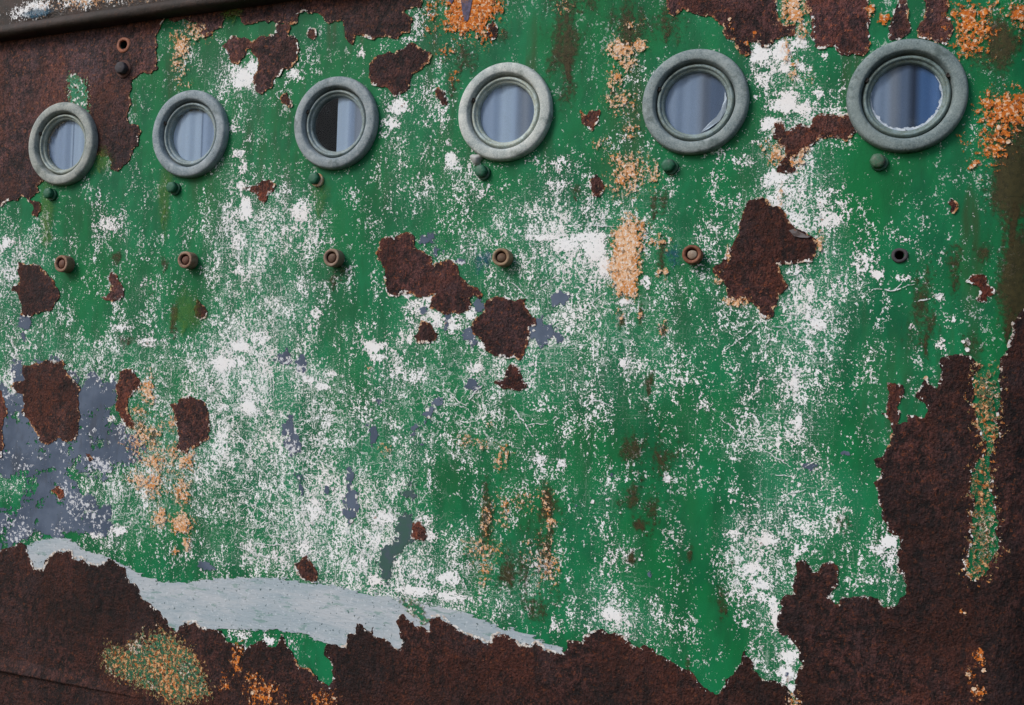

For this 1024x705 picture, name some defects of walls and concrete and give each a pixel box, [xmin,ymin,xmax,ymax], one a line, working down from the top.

rust [0,0,507,217]
rust [573,0,1024,355]
rust [11,262,60,317]
rust [375,232,537,391]
peeling [27,477,563,654]
rust [0,309,1024,705]
peeling [587,541,657,641]